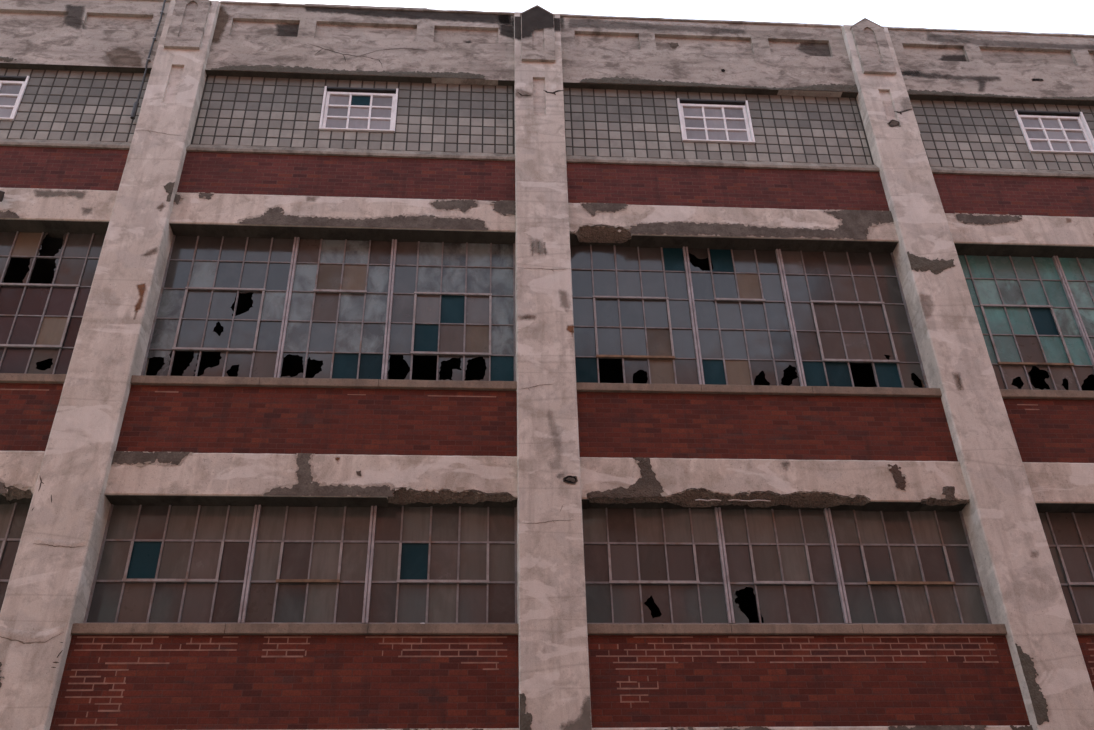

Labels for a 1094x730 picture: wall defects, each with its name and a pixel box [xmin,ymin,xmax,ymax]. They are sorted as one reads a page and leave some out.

peeling [262,453,518,505]
spalling [563,475,578,484]
spalling [587,457,871,508]
peeling [58,636,238,726]
peeling [519,693,532,730]
peeling [1010,643,1049,730]